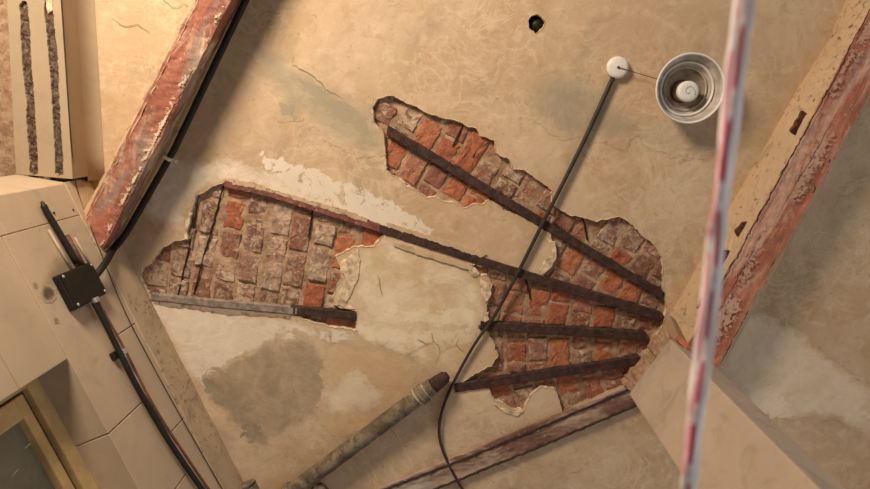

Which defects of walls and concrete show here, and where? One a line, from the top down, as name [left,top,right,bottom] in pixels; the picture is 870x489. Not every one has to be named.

spalling [19,1,44,178]
spalling [44,0,67,180]
spalling [140,95,667,417]
damp [200,326,419,450]
rust [384,389,636,489]